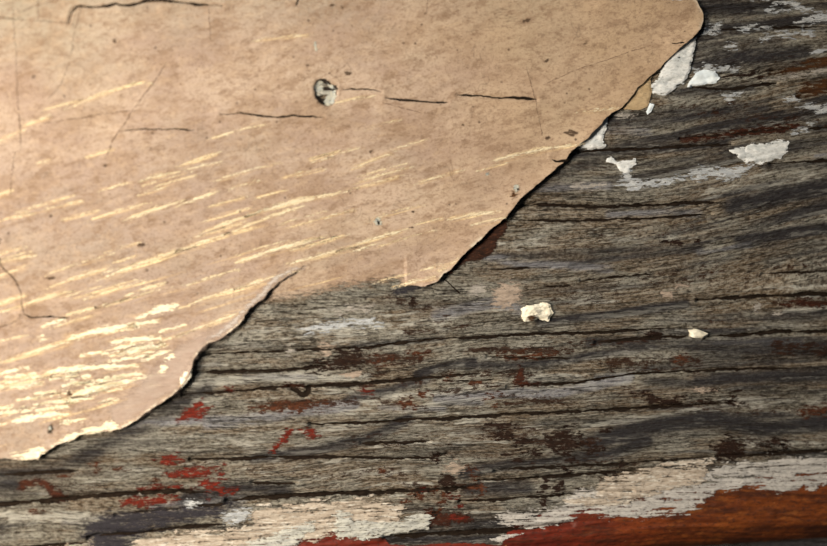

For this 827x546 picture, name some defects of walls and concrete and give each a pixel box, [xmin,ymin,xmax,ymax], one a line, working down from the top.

crack [0,0,223,24]
peeling [733,0,827,43]
crack [343,88,537,103]
peeling [0,0,757,460]
crack [512,201,726,222]
crack [697,270,827,300]
crack [707,328,827,338]
crack [186,328,794,397]
crack [190,403,724,461]
peeling [119,450,232,510]
peeling [220,507,253,525]
crack [0,449,827,546]